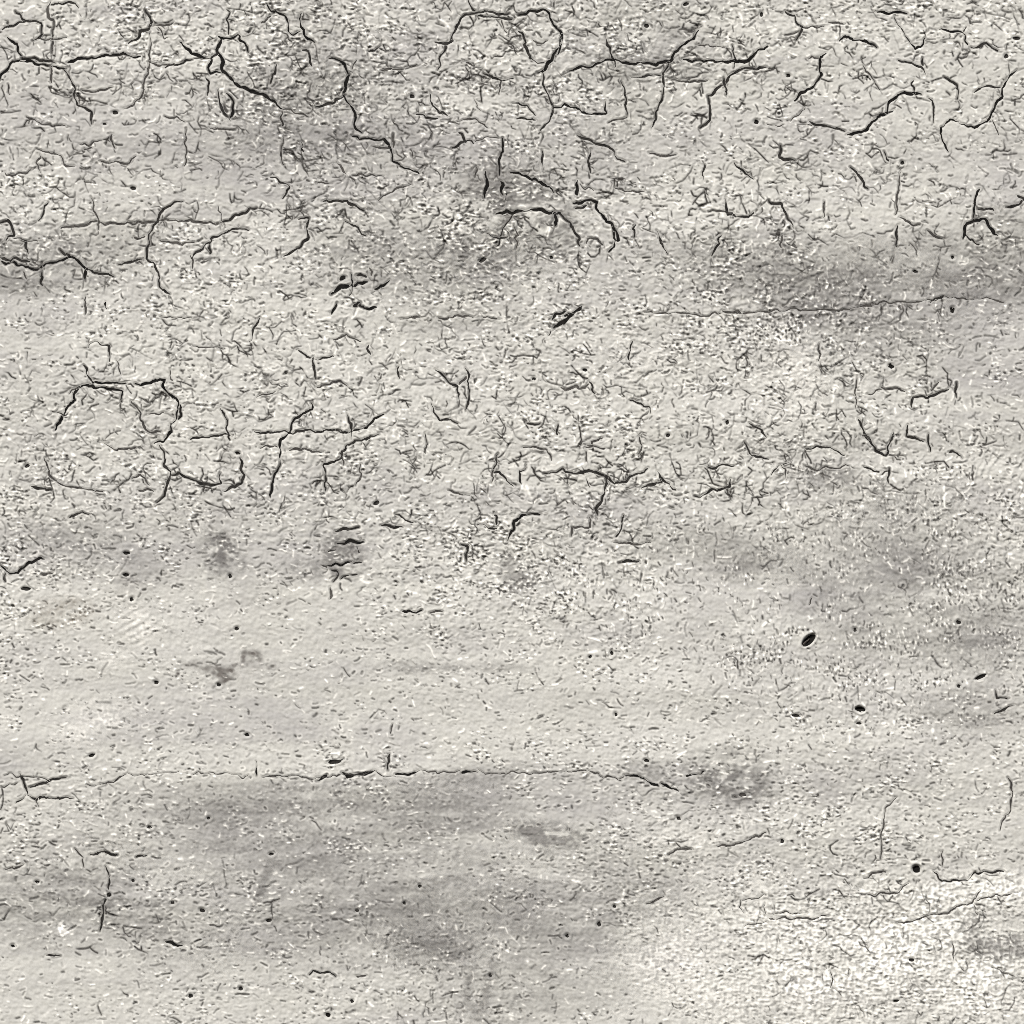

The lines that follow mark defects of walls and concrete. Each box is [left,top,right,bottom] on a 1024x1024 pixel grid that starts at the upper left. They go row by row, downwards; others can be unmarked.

crack [0,1,419,256]
crack [416,0,768,254]
crack [767,11,1015,161]
crack [0,198,256,319]
crack [708,199,793,256]
crack [884,151,1024,247]
crack [31,458,103,518]
crack [52,334,384,503]
crack [424,368,470,453]
crack [461,513,540,562]
crack [491,379,961,563]
crack [3,724,704,807]